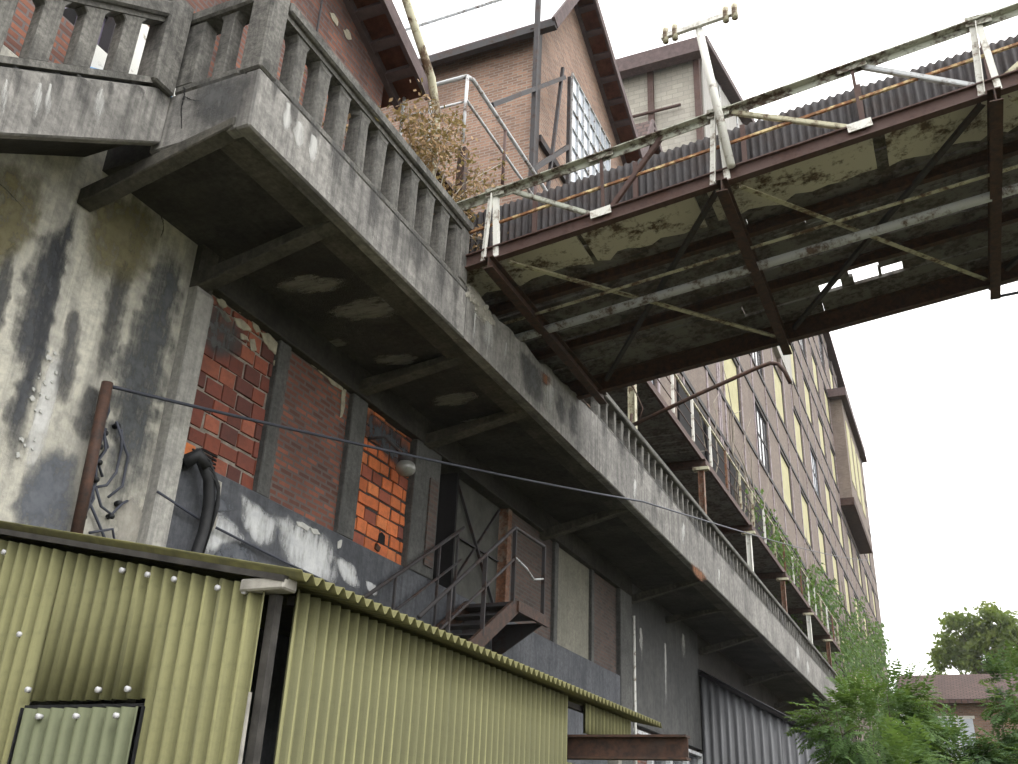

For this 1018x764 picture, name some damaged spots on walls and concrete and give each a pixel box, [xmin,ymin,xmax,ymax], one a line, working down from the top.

leakage [0,213,74,448]
leakage [58,311,79,397]
leakage [74,387,99,440]
leakage [99,257,183,492]
leakage [211,541,257,562]